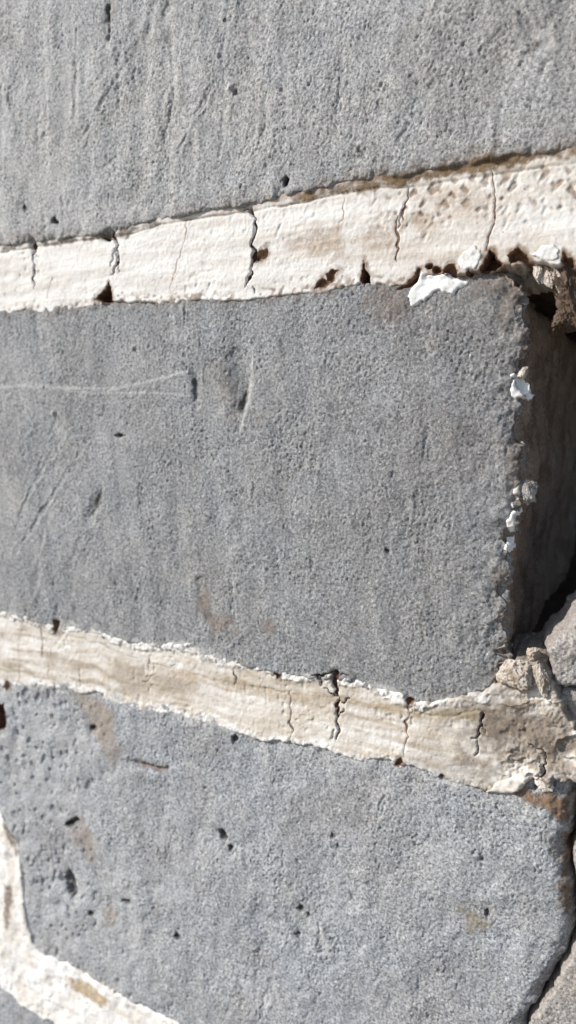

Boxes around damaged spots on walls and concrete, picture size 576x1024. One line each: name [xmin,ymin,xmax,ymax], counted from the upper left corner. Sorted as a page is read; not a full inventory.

crack [104,230,120,275]
crack [246,209,259,290]
spalling [326,269,339,283]
crack [395,187,410,262]
peeling [407,245,482,307]
crack [486,170,496,250]
peeling [529,244,576,294]
crack [314,670,348,738]
peeling [532,663,551,699]
crack [403,706,413,753]
crack [476,713,486,754]
peeling [486,773,554,793]